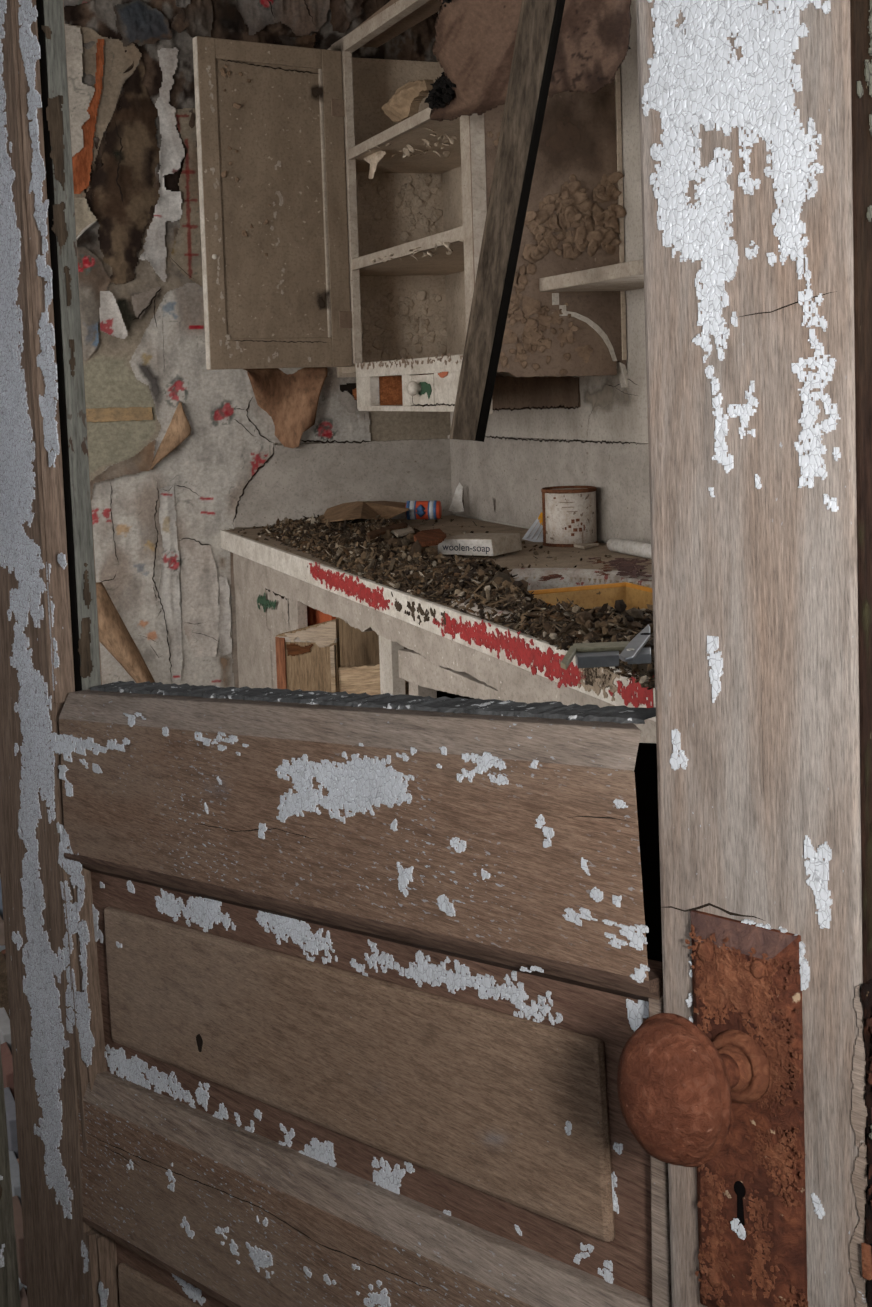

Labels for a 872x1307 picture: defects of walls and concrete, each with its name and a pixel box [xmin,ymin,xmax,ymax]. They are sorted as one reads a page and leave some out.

peeling [642,0,841,512]
crack [102,483,119,582]
crack [138,397,370,681]
peeling [0,0,262,1219]
peeling [258,743,417,839]
peeling [436,746,509,785]
peeling [256,910,563,1025]
peeling [562,857,650,983]
peeling [626,999,649,1032]
peeling [279,1123,337,1167]
peeling [372,1157,415,1194]
peeling [573,1243,614,1284]